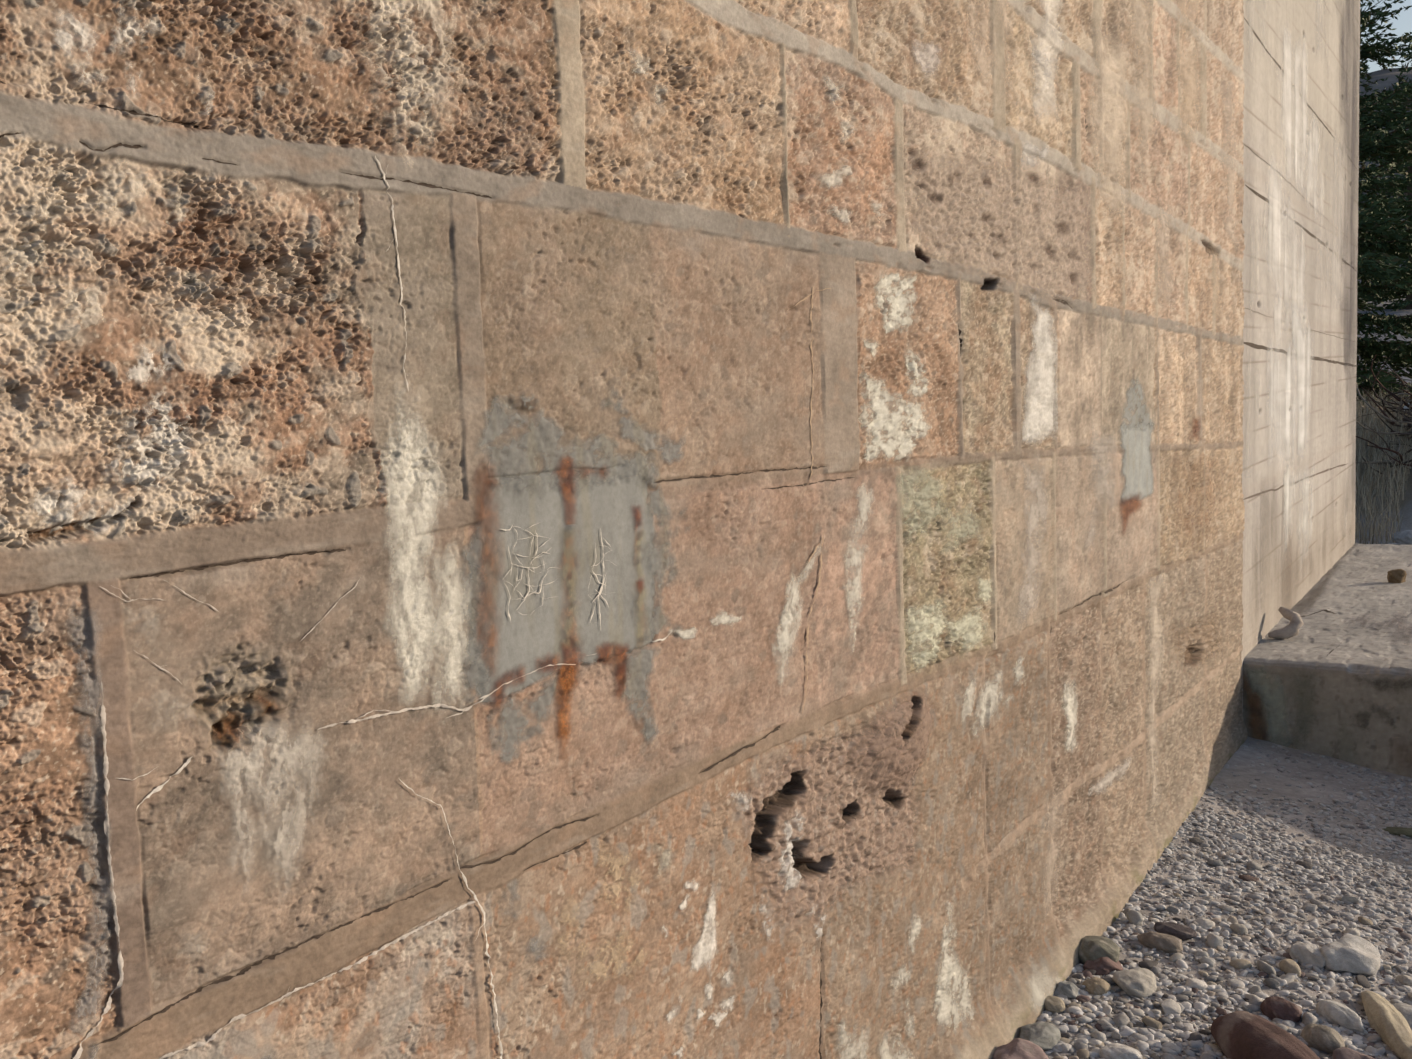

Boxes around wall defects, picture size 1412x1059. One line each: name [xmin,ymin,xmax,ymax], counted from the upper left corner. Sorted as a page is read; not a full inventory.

crack [342,156,491,391]
efflorescence [861,353,929,460]
efflorescence [1022,310,1057,441]
efflorescence [382,414,466,698]
corrosion [560,458,604,525]
corrosion [1122,497,1139,521]
spalling [191,668,275,742]
crack [317,523,615,730]
corrosion [541,643,578,735]
efflorescence [227,727,318,866]
crack [73,681,594,1059]
spalling [742,735,914,923]